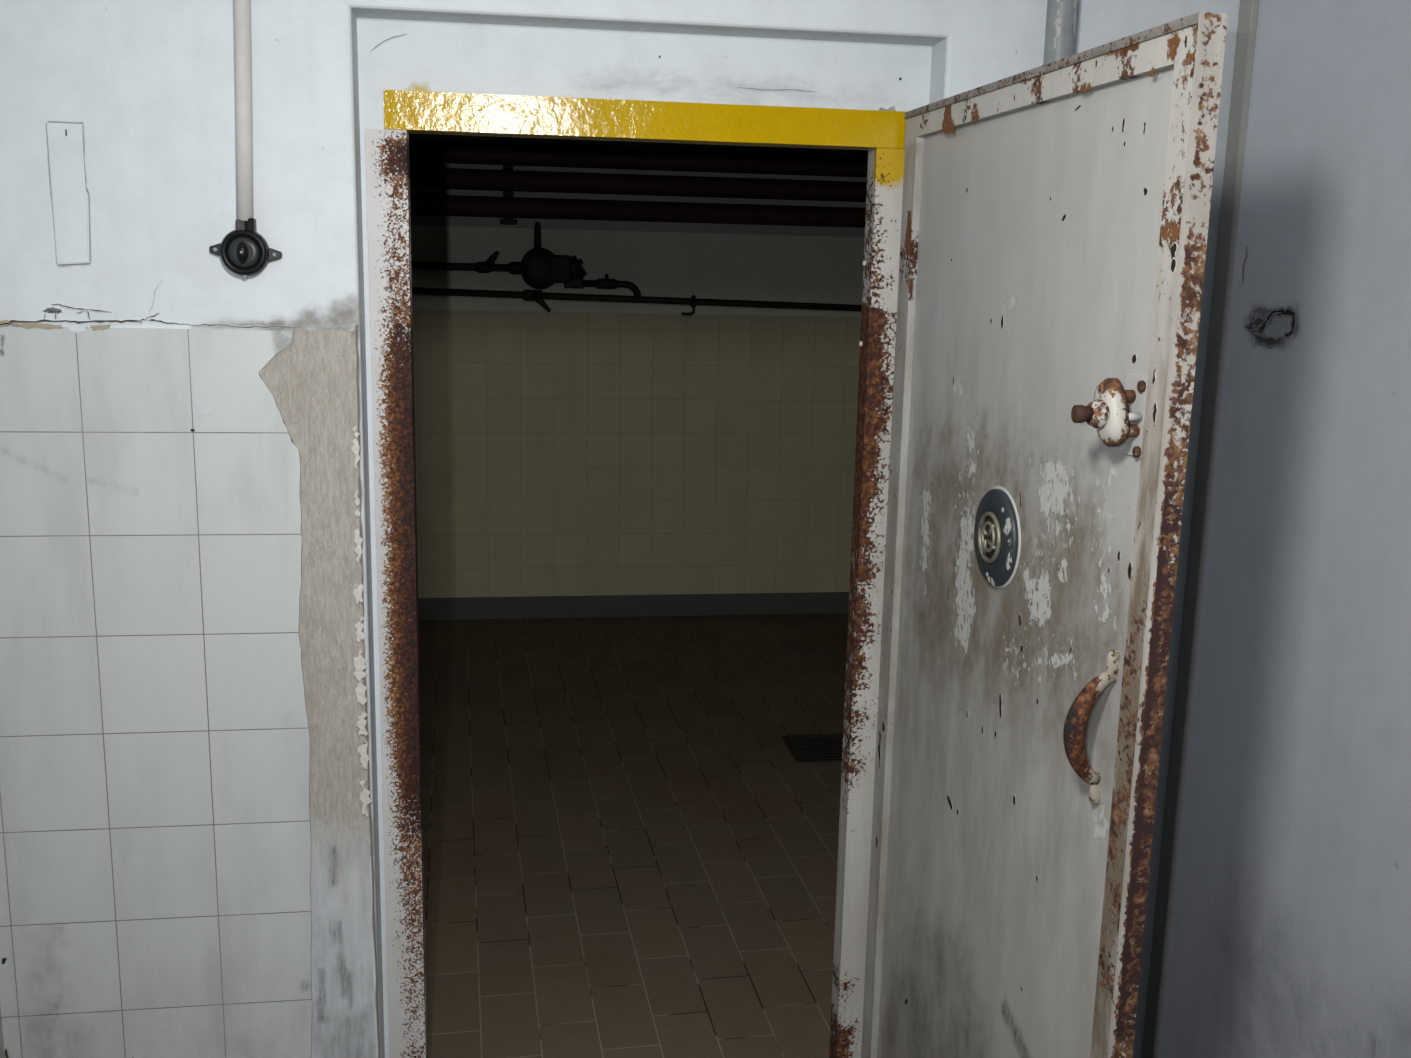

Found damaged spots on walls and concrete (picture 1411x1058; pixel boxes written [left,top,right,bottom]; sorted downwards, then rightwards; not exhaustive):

flaking render [1246,306,1297,349]
flaking render [260,330,376,1058]